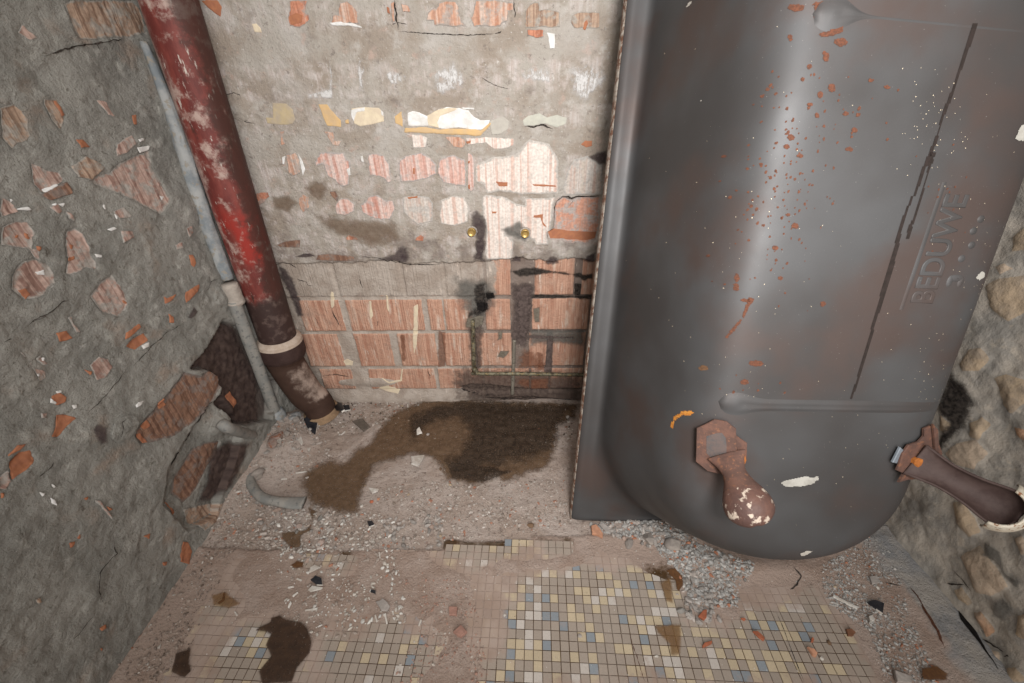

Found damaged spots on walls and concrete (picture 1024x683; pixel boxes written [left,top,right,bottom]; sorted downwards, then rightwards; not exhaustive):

flaking render [278,107,603,259]
leakage [472,212,486,260]
leakage [505,222,526,239]
flaking render [125,324,149,350]
spalling [136,370,221,443]
leakage [279,254,595,547]
spalling [164,441,223,531]
flaking render [180,542,192,564]
leakage [171,650,190,677]
leakage [256,616,311,683]